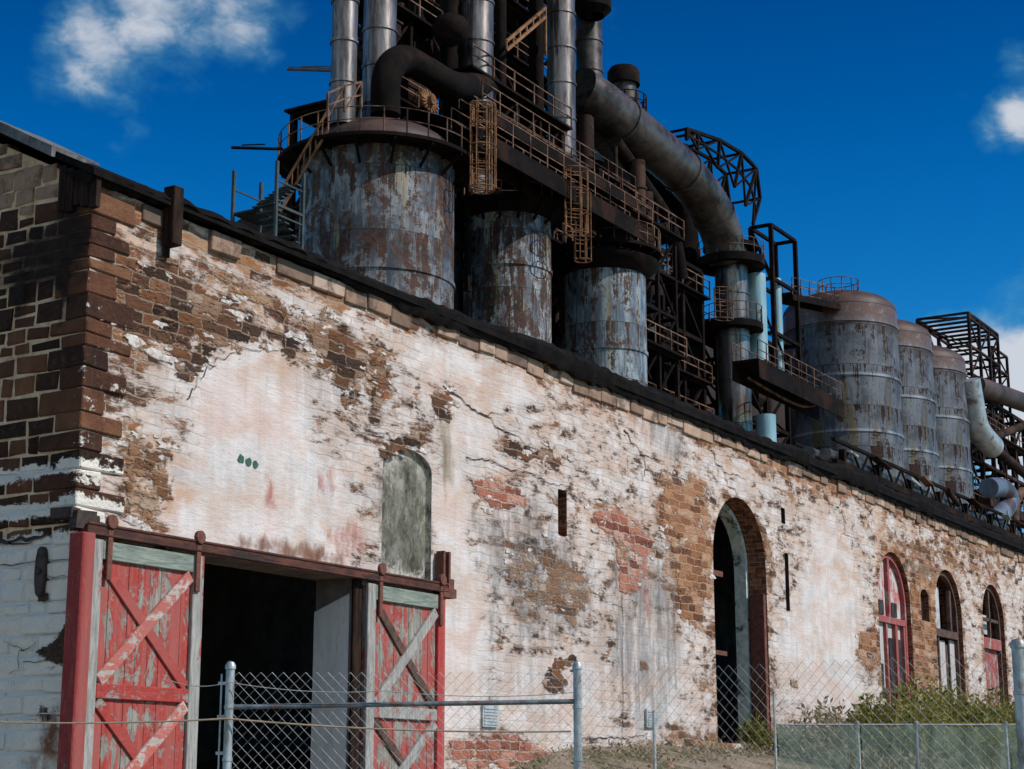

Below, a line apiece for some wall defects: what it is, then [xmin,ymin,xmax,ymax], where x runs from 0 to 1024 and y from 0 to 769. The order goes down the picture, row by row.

spalling [116,431,182,532]
crack [187,338,265,399]
spalling [109,257,394,411]
spalling [379,431,429,462]
damp [380,454,429,565]
spalling [431,384,461,423]
peeling [472,471,527,515]
crack [449,392,566,487]
spalling [499,533,599,636]
peeling [584,472,716,630]
peeling [855,623,880,675]